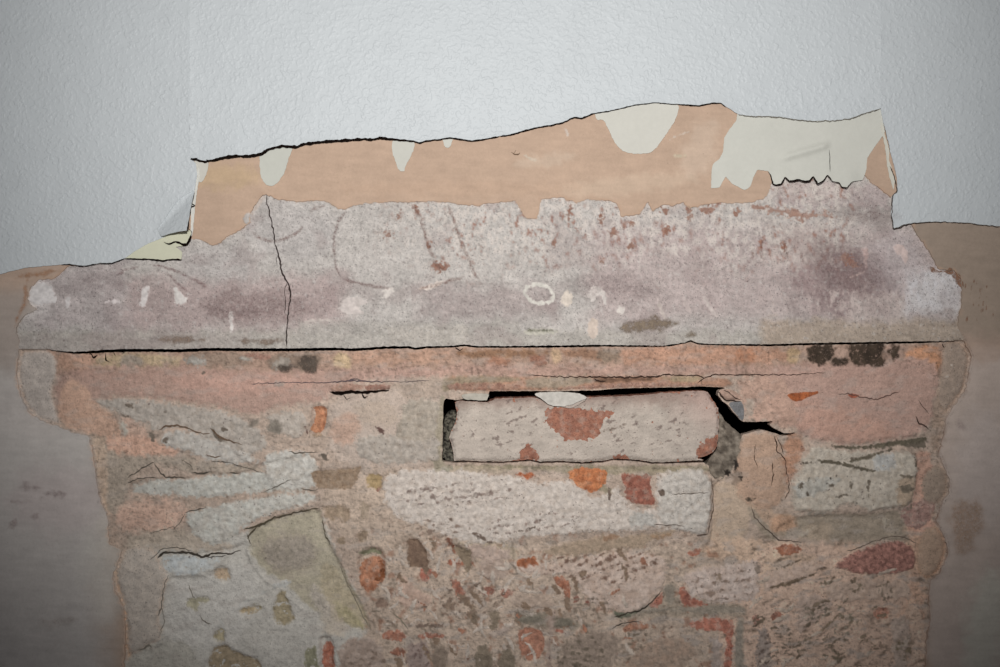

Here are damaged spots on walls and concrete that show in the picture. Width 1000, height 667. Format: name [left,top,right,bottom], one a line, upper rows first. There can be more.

crack [62,192,944,362]
spalling [13,175,975,667]
crack [128,424,330,650]